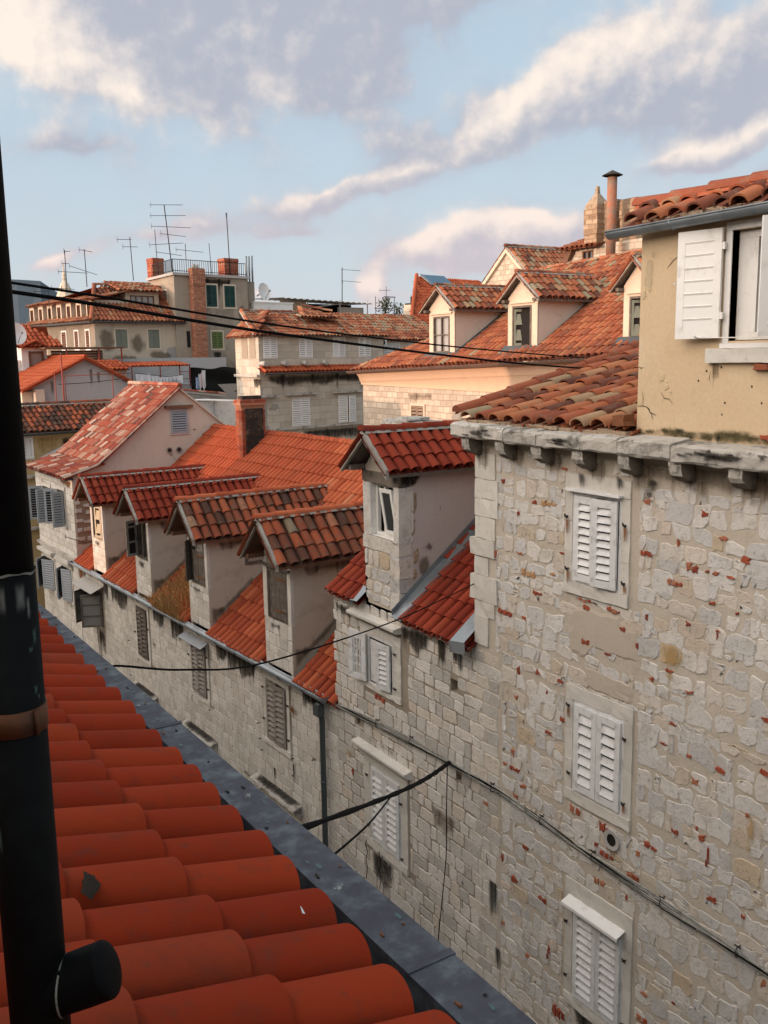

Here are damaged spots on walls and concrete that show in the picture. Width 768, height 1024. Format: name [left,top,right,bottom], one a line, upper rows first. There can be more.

damp [373,852,391,886]